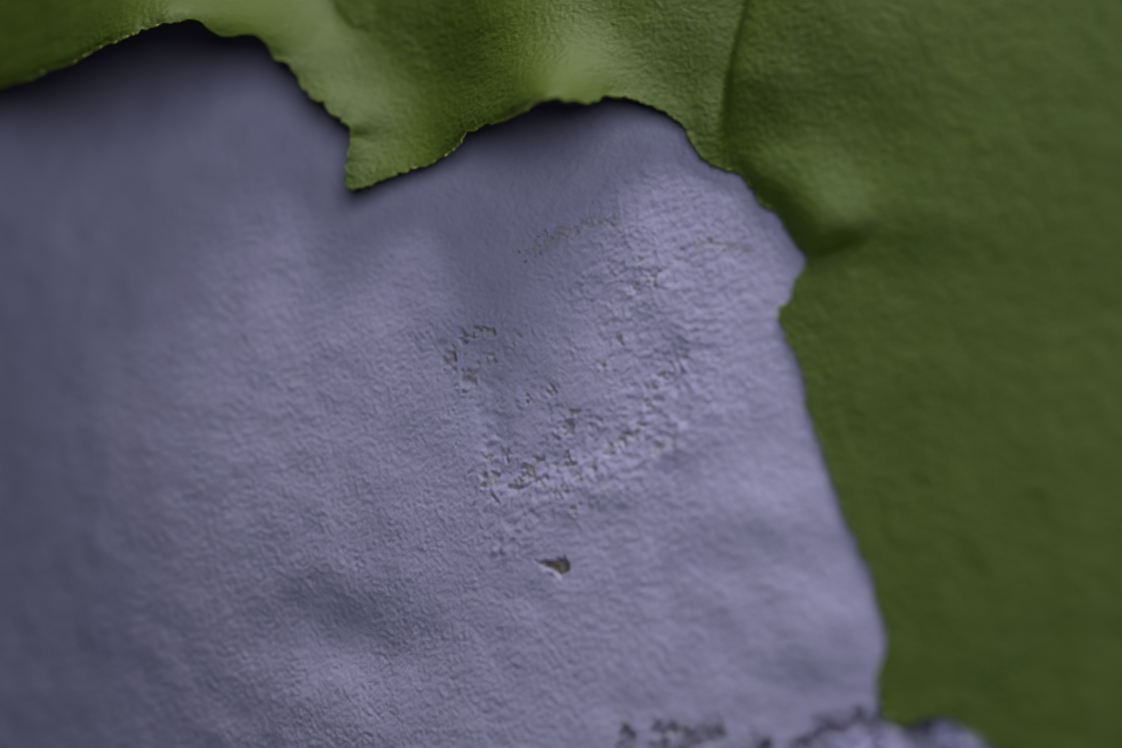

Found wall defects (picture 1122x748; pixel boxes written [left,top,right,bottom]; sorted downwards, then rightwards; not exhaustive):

peeling [0,0,725,190]
flaking render [619,246,671,301]
flaking render [472,341,701,531]
peeling [705,0,1122,748]
spalling [528,550,575,582]